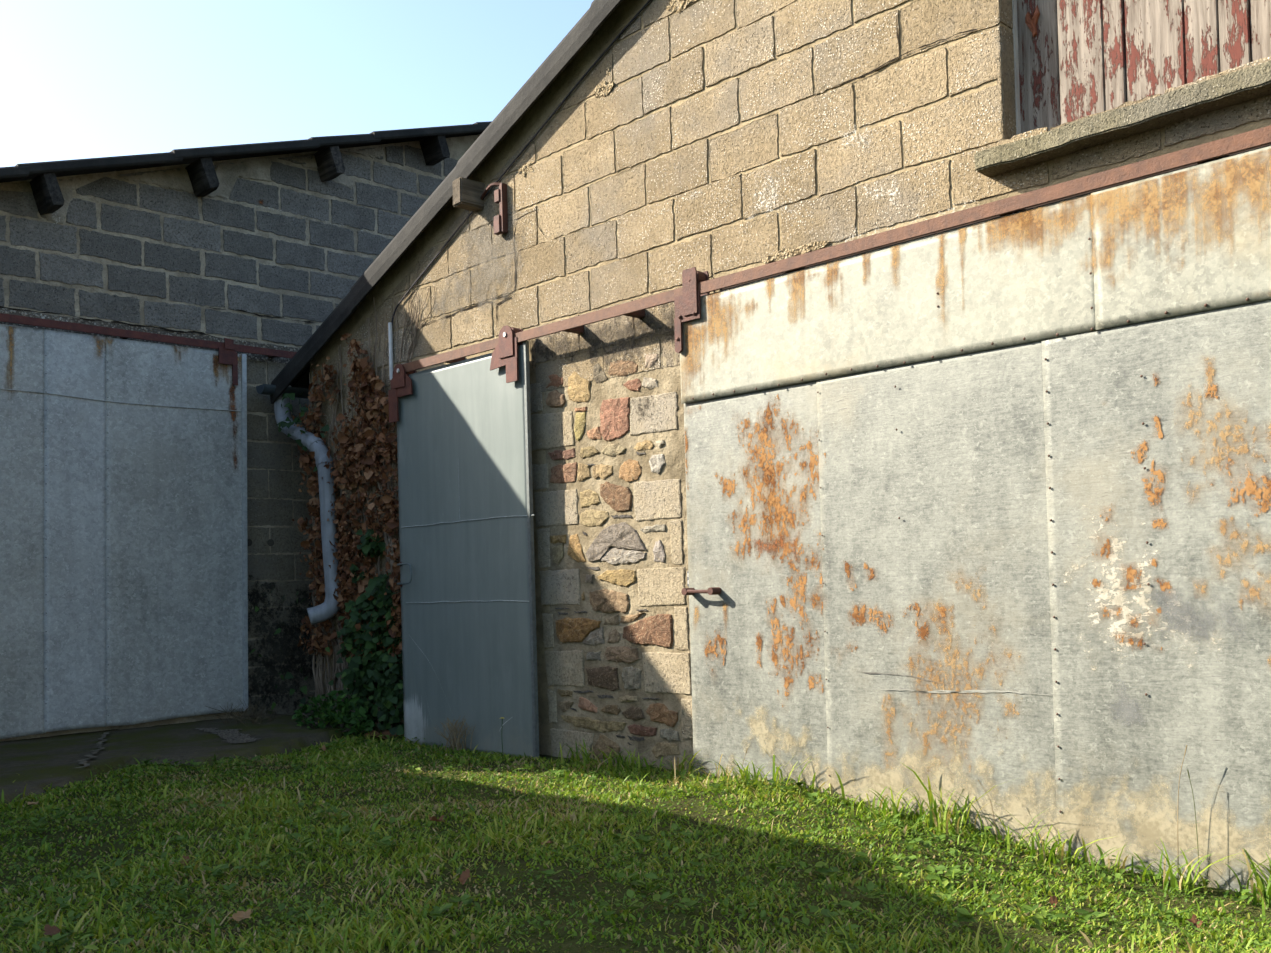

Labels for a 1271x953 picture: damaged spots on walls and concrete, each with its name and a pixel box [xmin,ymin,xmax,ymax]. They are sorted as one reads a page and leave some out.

corrosion [683,292,753,372]
corrosion [767,270,809,317]
corrosion [936,235,945,295]
corrosion [987,148,1271,269]
corrosion [213,355,241,468]
corrosion [1131,415,1169,529]
corrosion [1181,358,1271,578]
corrosion [715,394,826,707]
corrosion [1091,539,1110,559]
corrosion [1123,559,1172,591]
corrosion [704,603,726,671]
corrosion [843,560,1020,774]